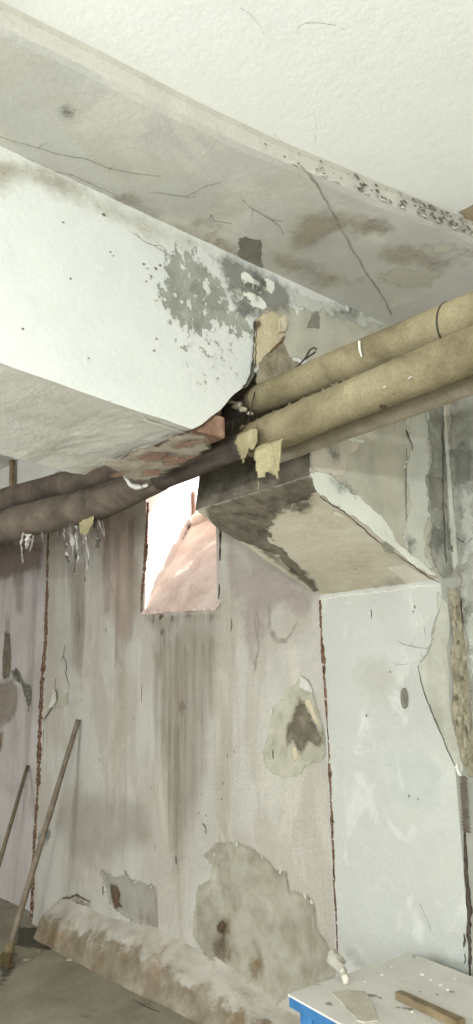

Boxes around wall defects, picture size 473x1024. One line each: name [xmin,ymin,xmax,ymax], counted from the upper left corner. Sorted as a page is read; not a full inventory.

peeling [238,237,263,268]
peeling [142,243,389,391]
spalling [316,160,473,236]
spalling [104,410,225,490]
flaking render [206,395,473,778]
flaking render [11,668,32,712]
corrosion [31,533,50,864]
corrosion [319,600,338,950]
flaking render [97,868,158,928]
flaking render [193,831,336,1005]